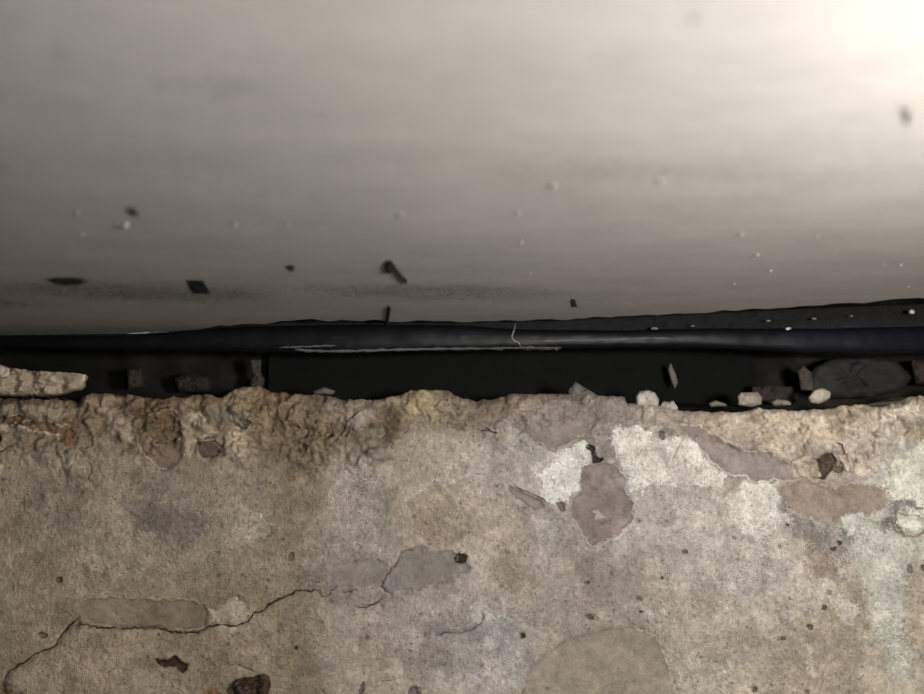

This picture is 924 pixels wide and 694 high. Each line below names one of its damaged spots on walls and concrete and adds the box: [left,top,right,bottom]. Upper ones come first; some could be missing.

crack [0,394,70,402]
spalling [508,462,636,548]
spalling [678,422,895,521]
spalling [386,543,472,591]
spalling [75,594,209,632]
crack [3,550,417,694]